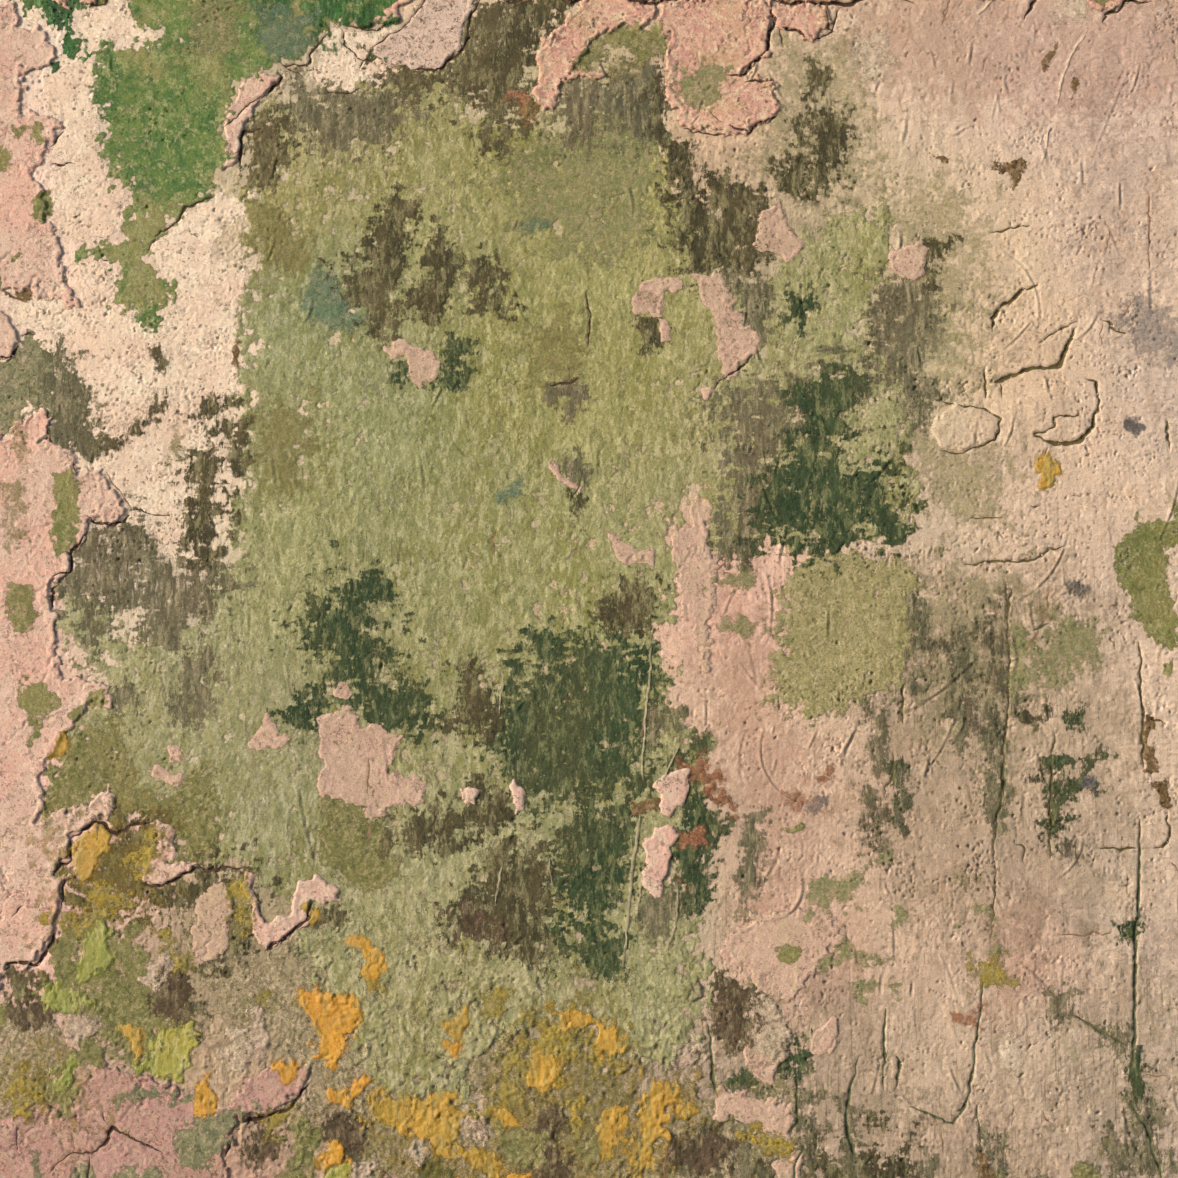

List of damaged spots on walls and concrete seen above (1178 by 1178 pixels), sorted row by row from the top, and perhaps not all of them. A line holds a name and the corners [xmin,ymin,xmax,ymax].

crack [222,0,425,167]
crack [730,0,863,83]
flaking render [1053,0,1138,25]
crack [941,302,1132,455]
flaking render [0,0,706,1178]
peeling [663,495,793,673]
leakage [266,540,834,996]
leakage [853,570,1040,863]
leakage [1031,743,1119,863]
crack [265,904,311,951]
peeling [891,905,915,927]
leakage [1070,1022,1178,1178]